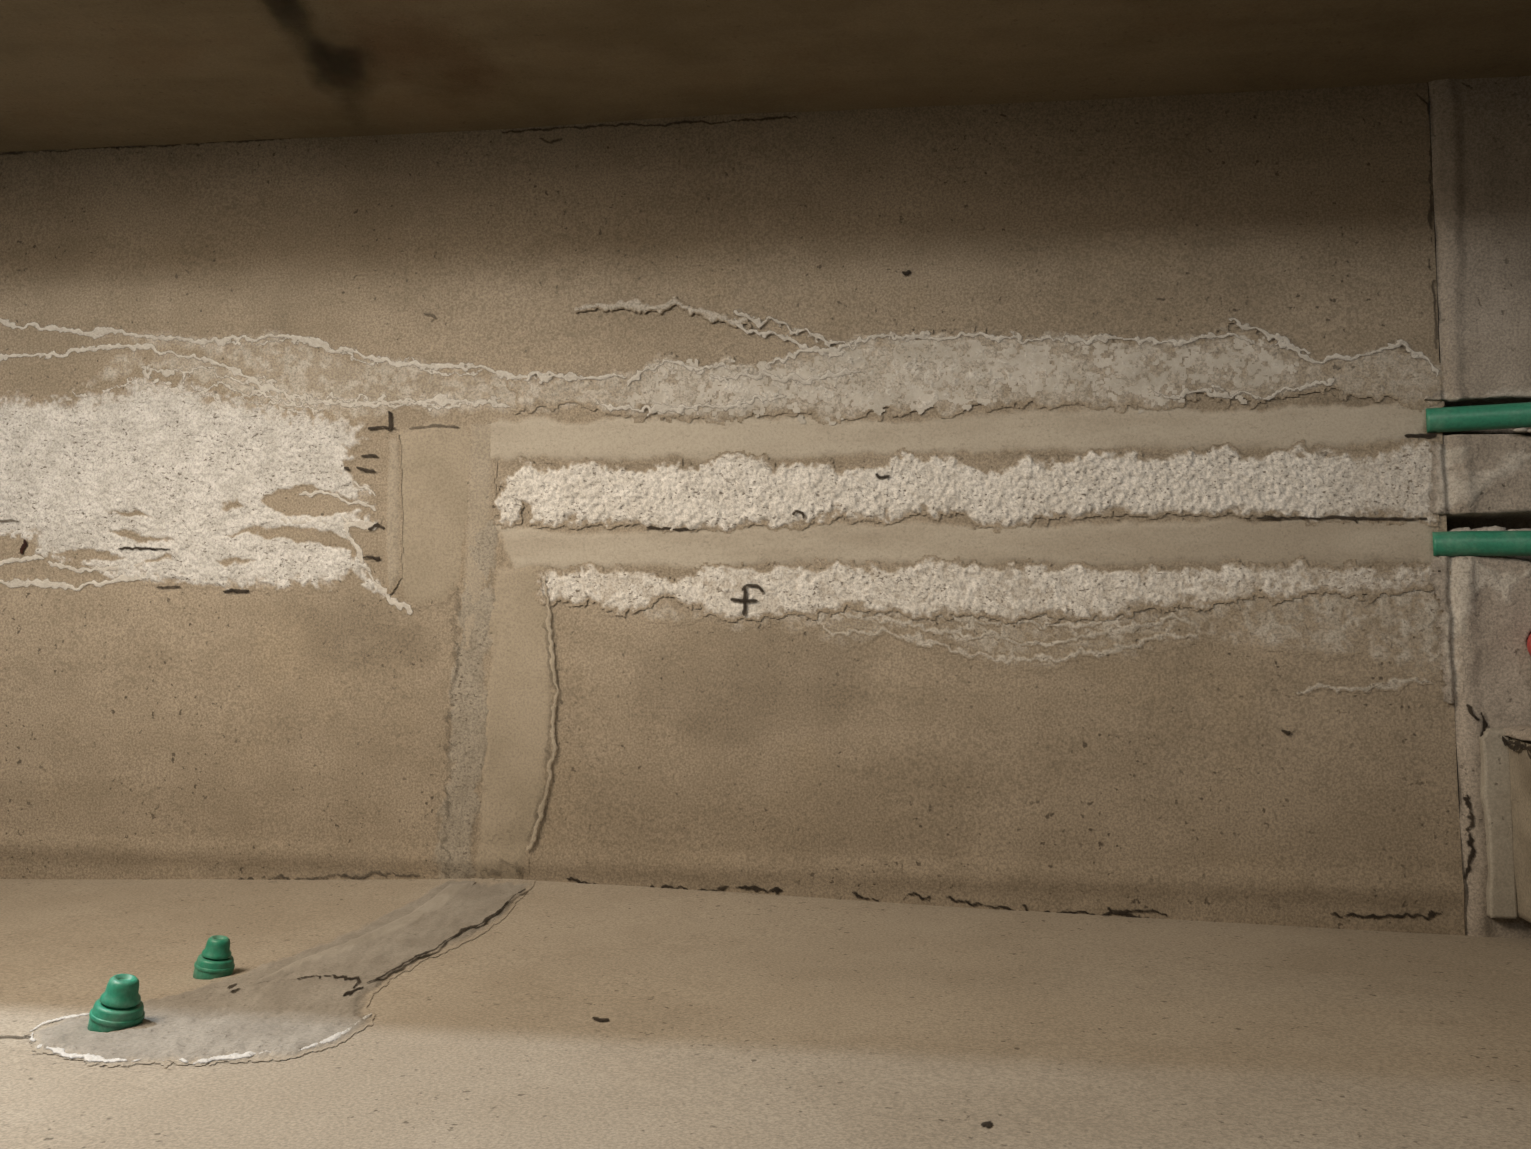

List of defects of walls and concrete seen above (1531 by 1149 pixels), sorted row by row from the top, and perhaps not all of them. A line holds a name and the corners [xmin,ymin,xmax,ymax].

leakage [0,295,1531,615]
leakage [532,555,1531,703]
crack [237,871,420,880]
crack [566,876,596,884]
crack [650,884,783,894]
crack [852,891,1167,918]
crack [297,889,526,996]